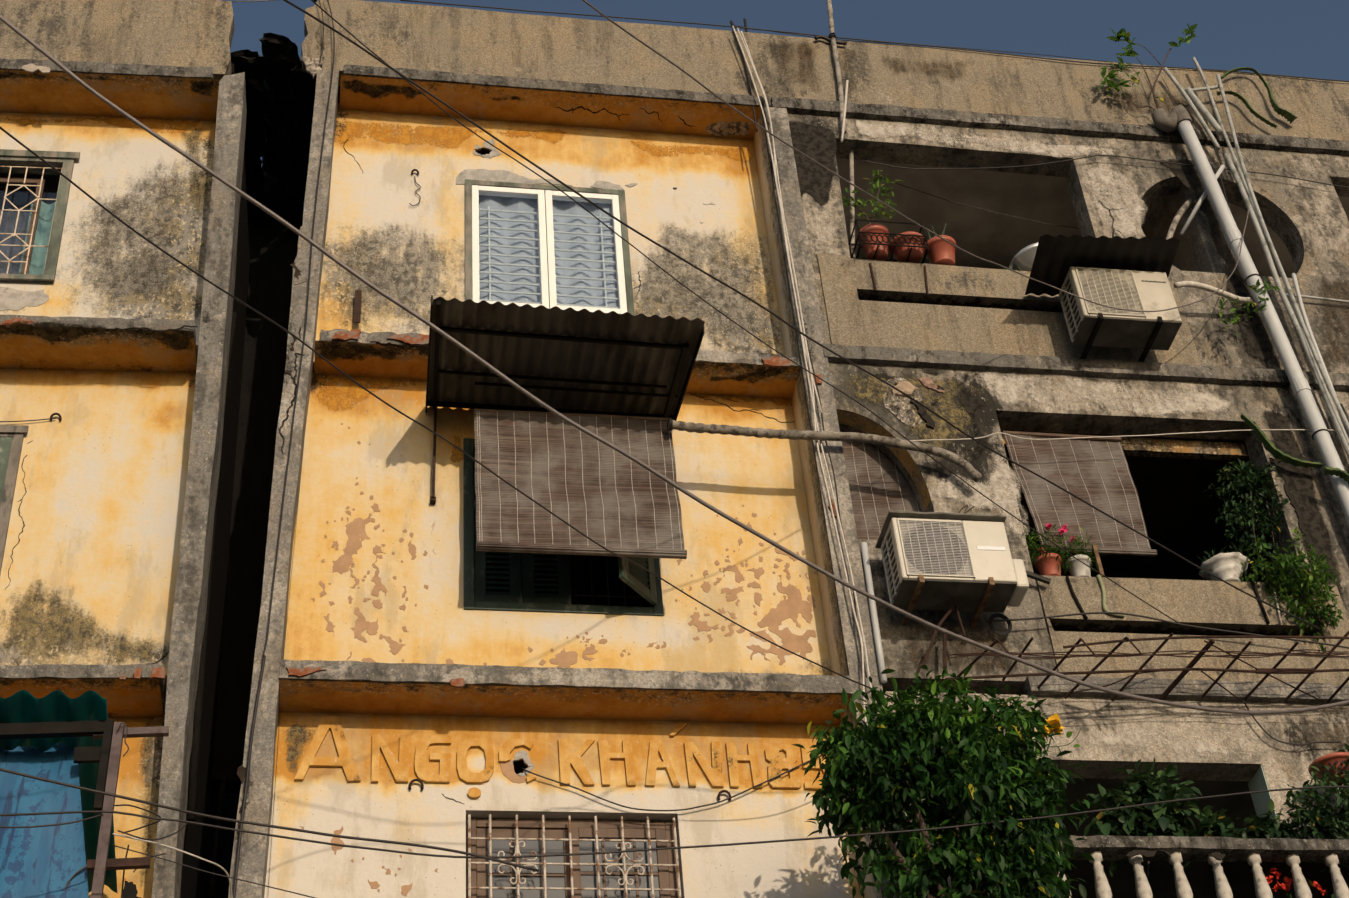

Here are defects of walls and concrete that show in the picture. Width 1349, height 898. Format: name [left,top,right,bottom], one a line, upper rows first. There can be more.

damp [7,117,208,305]
damp [339,226,445,317]
damp [643,225,771,337]
crack [5,440,33,590]
damp [4,585,154,662]
peeling [312,477,434,663]
peeling [528,632,608,668]
peeling [675,505,817,665]
spalling [875,373,944,430]
damp [851,367,1230,534]